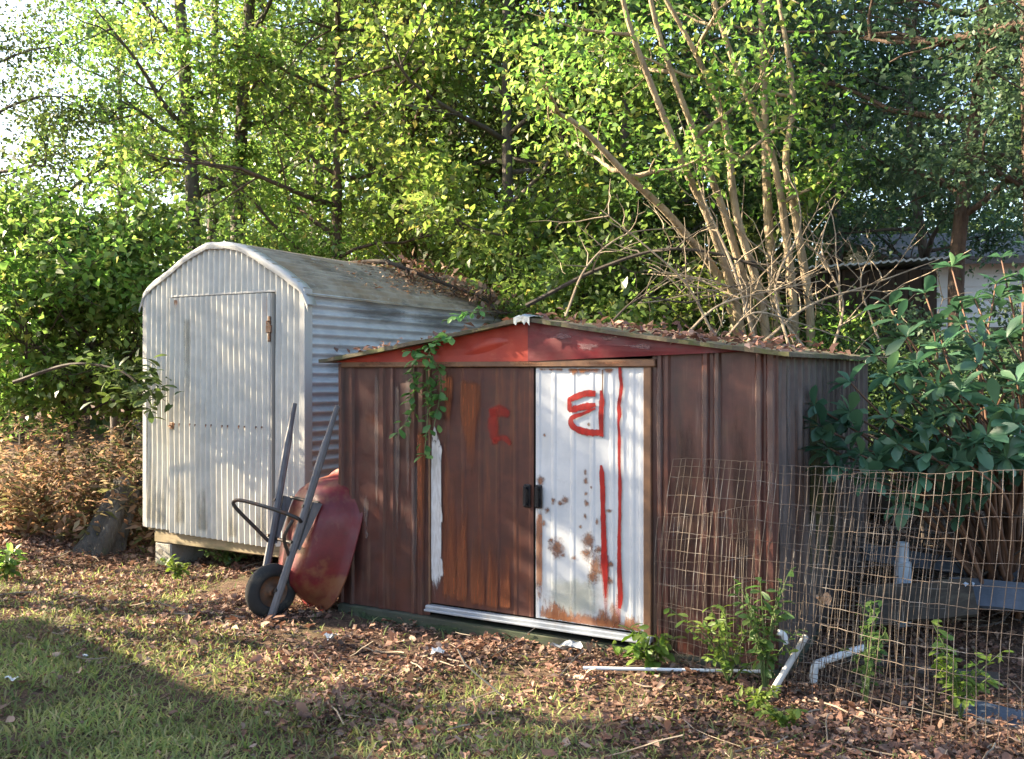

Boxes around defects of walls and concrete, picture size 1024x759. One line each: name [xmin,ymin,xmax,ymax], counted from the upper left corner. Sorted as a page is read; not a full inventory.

corrosion [434,362,478,451]
corrosion [443,516,510,608]
corrosion [536,470,641,632]